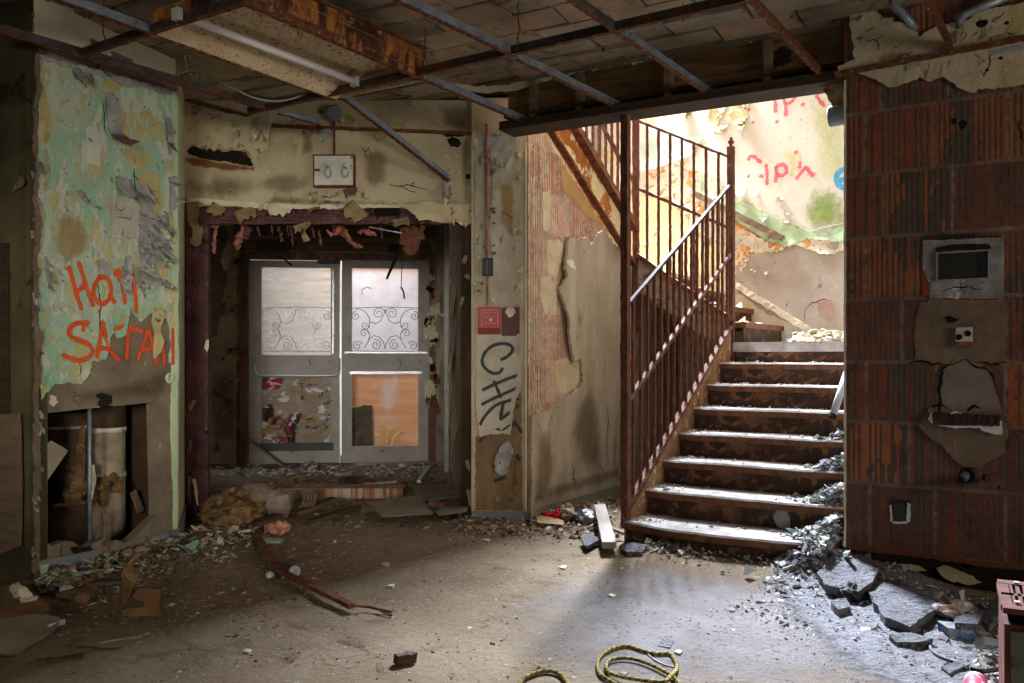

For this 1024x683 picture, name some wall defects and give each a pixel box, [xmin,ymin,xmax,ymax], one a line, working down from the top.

flaking render [837,2,1024,93]
damp [809,194,841,225]
peeling [13,53,524,578]
flaking render [465,104,844,518]
crack [910,359,1007,412]
spalling [847,543,1024,585]